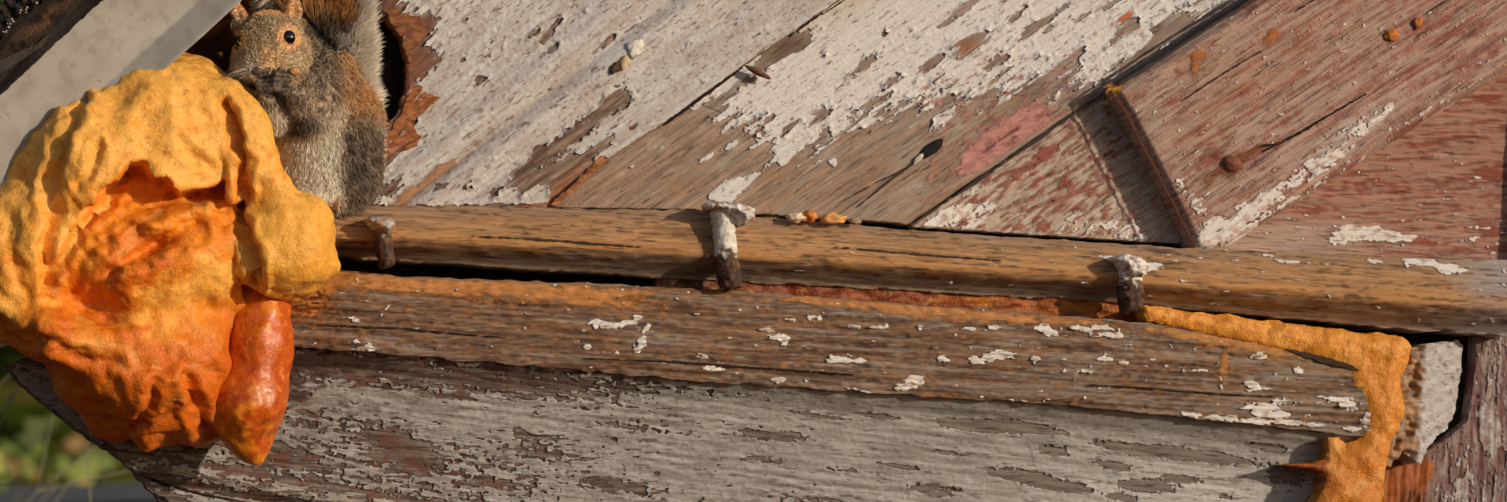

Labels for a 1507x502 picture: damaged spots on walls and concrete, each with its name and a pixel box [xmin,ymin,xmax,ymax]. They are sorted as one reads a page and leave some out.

peeling [527,7,572,54]
peeling [381,0,466,138]
peeling [415,79,637,207]
peeling [699,0,1507,291]
peeling [370,152,404,206]
peeling [728,303,839,348]
peeling [846,314,889,342]
peeling [805,353,867,382]
peeling [721,410,899,464]
peeling [768,484,858,502]